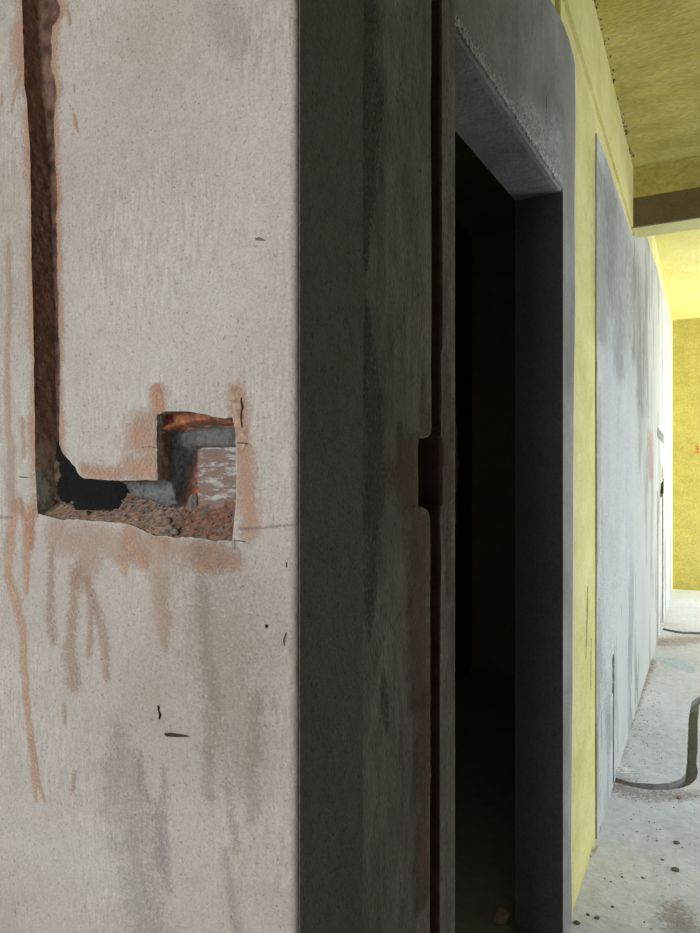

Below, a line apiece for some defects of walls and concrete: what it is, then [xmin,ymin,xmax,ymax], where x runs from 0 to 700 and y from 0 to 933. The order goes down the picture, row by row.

corrosion [0,0,31,206]
corrosion [51,0,70,362]
corrosion [4,221,45,803]